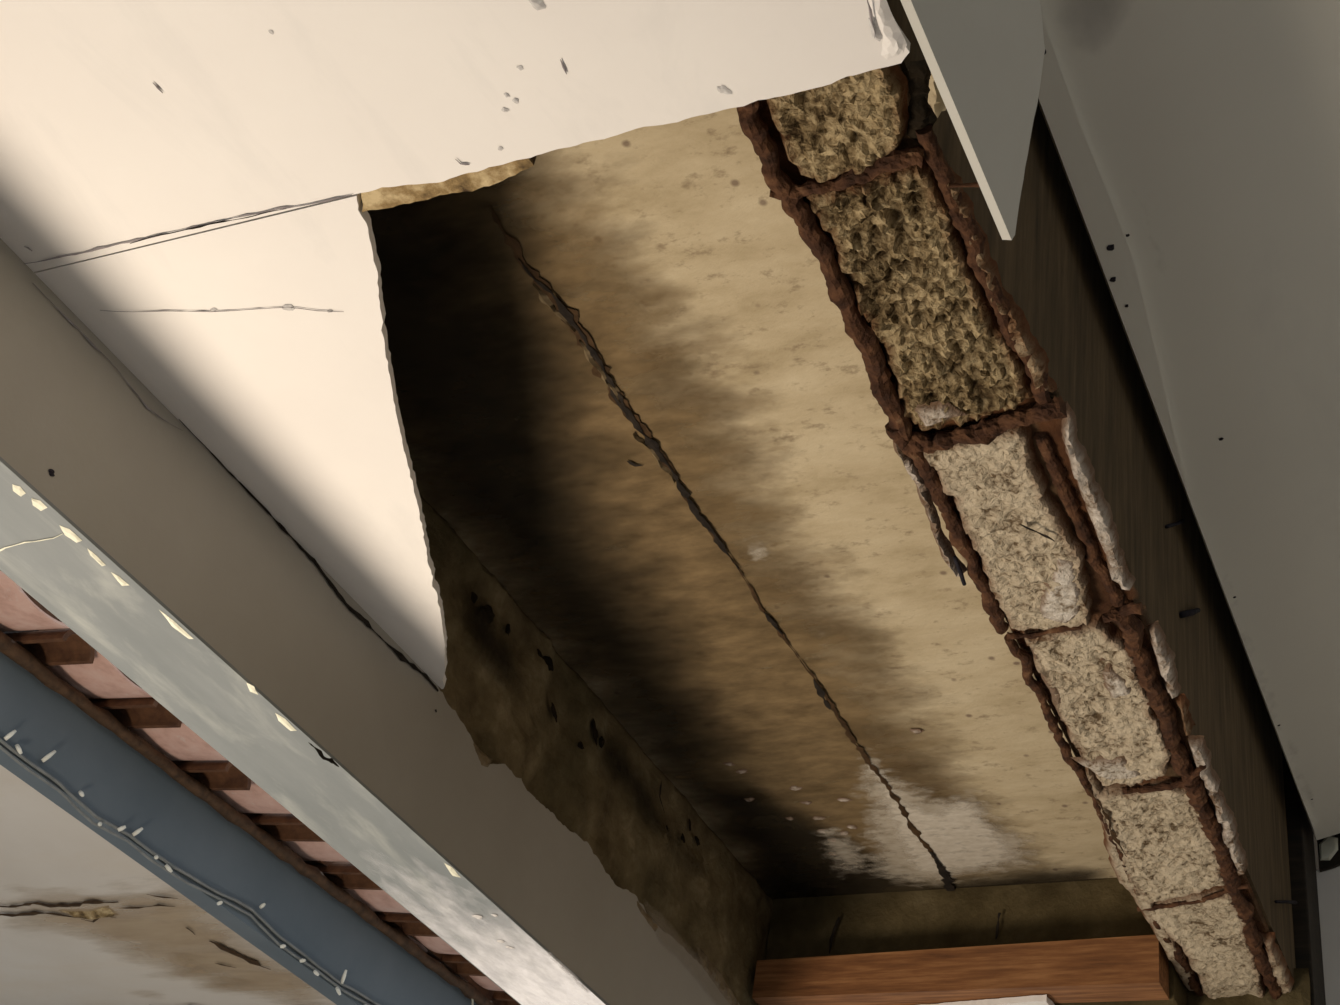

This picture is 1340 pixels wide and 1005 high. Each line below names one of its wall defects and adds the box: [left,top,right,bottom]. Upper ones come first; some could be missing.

spalling [361,146,537,212]
rust [758,99,840,268]
crack [24,195,439,692]
crack [490,206,955,891]
water stain [360,171,1094,899]
rust [910,390,1057,434]
rust [1038,418,1107,564]
rust [1005,620,1029,650]
rust [1115,582,1196,769]
water stain [46,898,310,991]